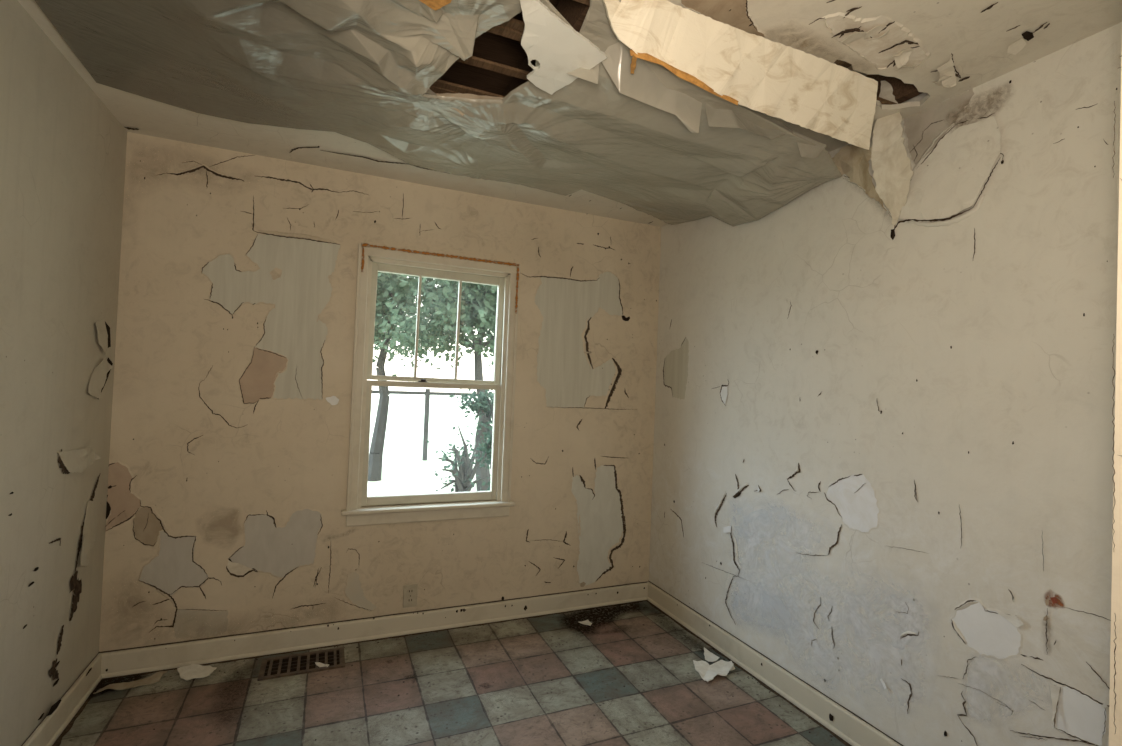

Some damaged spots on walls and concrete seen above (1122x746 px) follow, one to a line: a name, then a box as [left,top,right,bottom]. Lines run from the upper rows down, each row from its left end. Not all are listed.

peeling [679,0,768,38]
crack [159,146,450,233]
peeling [238,346,288,412]
peeling [570,459,626,595]
peeling [807,472,881,555]
flaking render [704,648,720,662]
peeling [950,589,1024,661]
peeling [1050,683,1109,746]